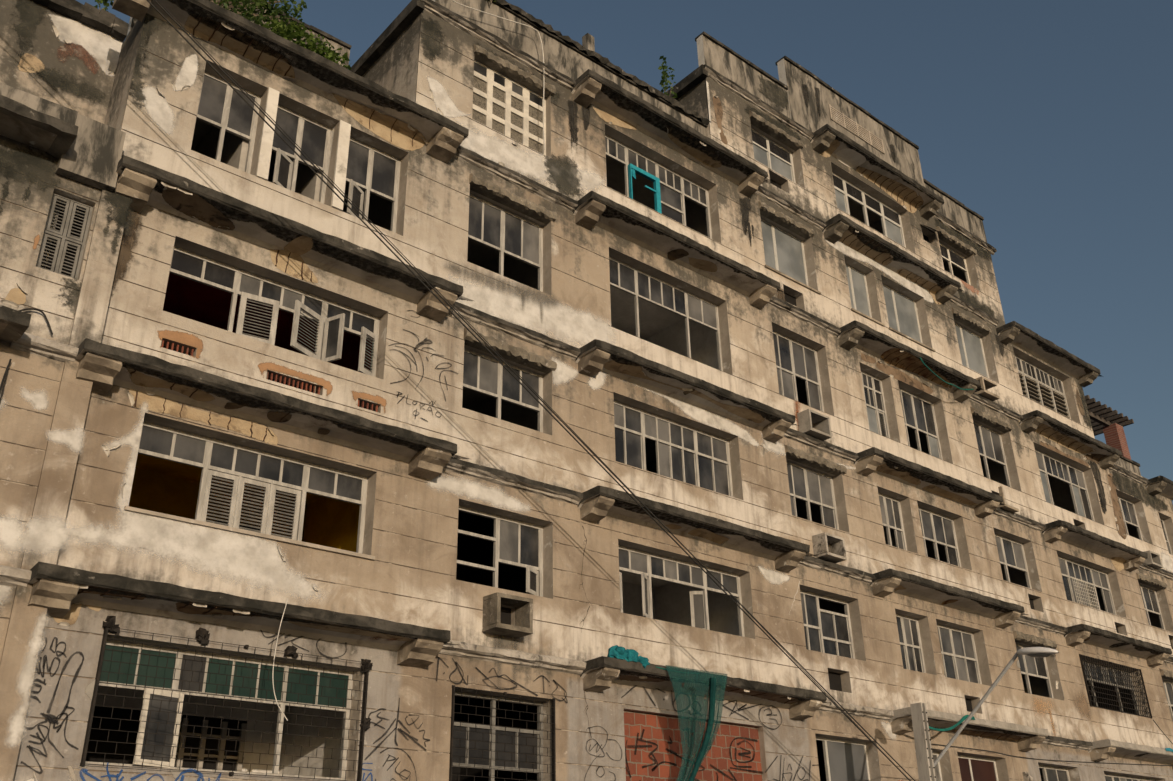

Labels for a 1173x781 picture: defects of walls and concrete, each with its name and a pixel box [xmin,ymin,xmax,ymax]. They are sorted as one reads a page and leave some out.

peeling [49,14,124,76]
peeling [142,54,198,133]
spalling [332,93,428,151]
damp [588,76,775,184]
damp [0,146,60,214]
spalling [161,182,235,230]
damp [104,166,474,301]
spalling [270,236,318,283]
damp [544,93,785,301]
spalling [861,348,952,394]
damp [1016,327,1121,457]
damp [1088,461,1169,514]